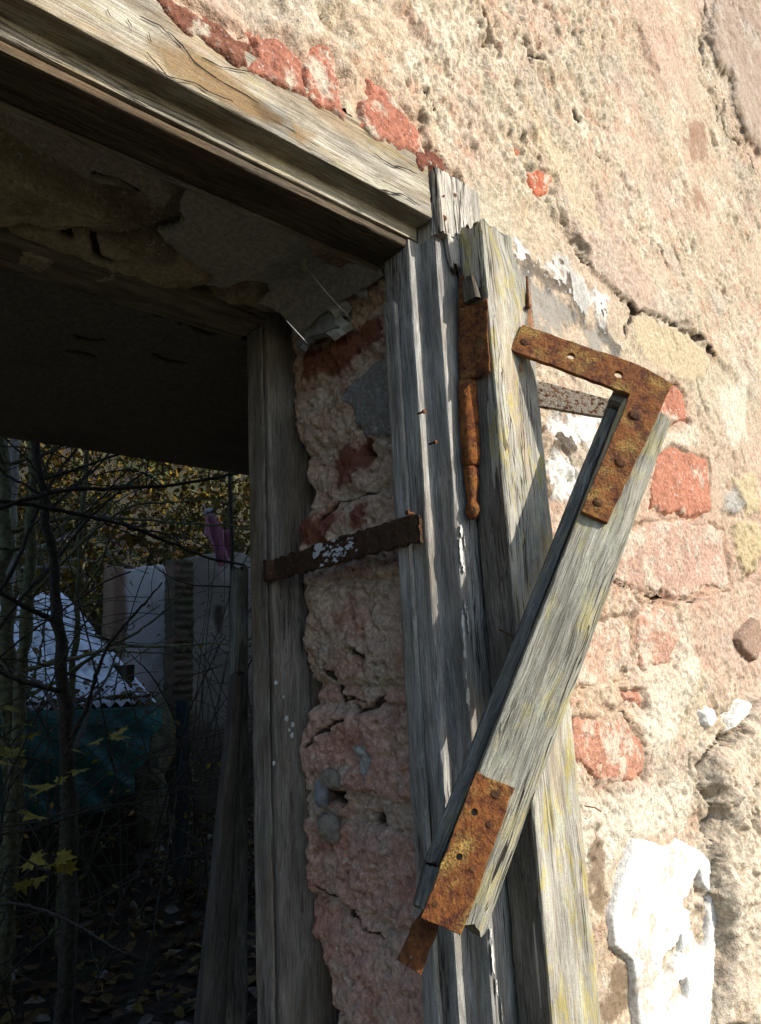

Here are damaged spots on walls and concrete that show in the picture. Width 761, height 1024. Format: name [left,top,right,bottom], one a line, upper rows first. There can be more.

spalling [156,0,452,177]
peeling [157,189,384,378]
crack [572,235,715,357]
spalling [336,438,378,486]
spalling [660,385,686,426]
spalling [300,504,364,567]
spalling [577,447,729,689]
spalling [571,691,644,789]